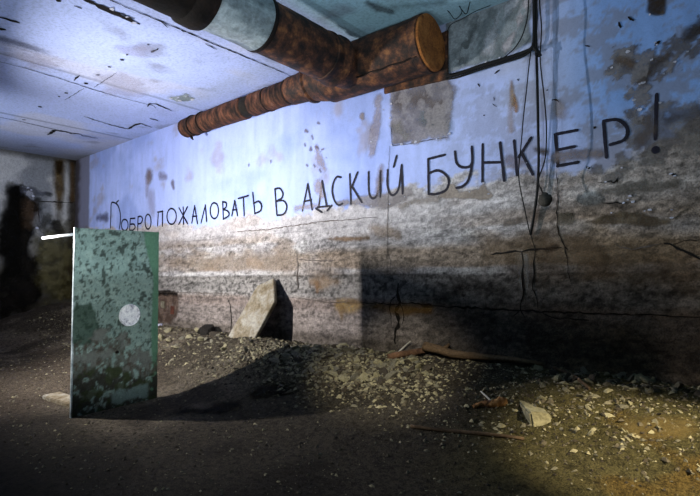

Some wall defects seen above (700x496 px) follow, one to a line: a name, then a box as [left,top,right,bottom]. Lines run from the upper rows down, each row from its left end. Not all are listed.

crack [56,0,290,76]
rust [258,2,358,89]
crack [0,62,171,138]
spalling [369,80,455,155]
crack [277,172,700,344]